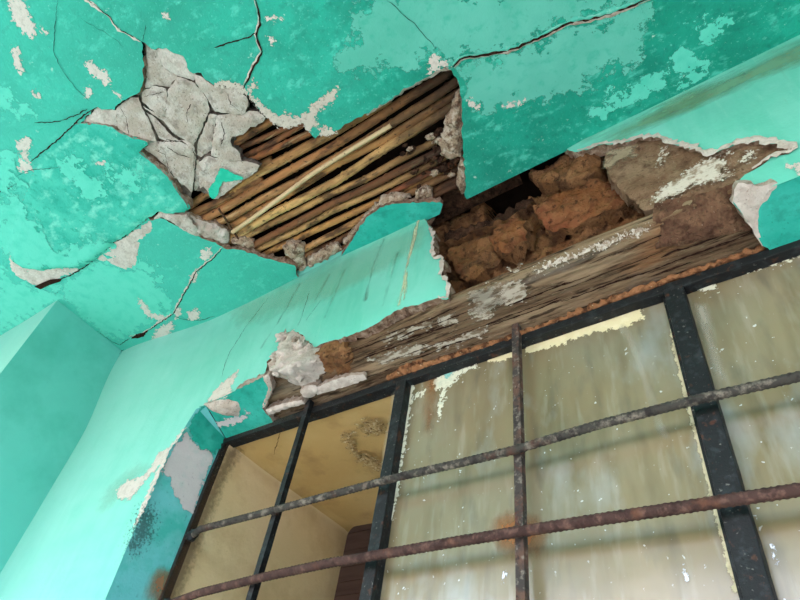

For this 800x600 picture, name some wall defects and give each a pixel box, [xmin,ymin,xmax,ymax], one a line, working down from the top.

crack [0,0,98,192]
crack [81,0,146,47]
crack [214,0,263,89]
spalling [282,0,800,298]
crack [452,0,649,68]
crack [62,217,149,279]
peeling [0,136,255,343]
crack [99,248,221,345]
spalling [262,329,368,415]
rust [386,245,766,381]
peeling [115,369,251,527]
spalling [191,371,800,538]